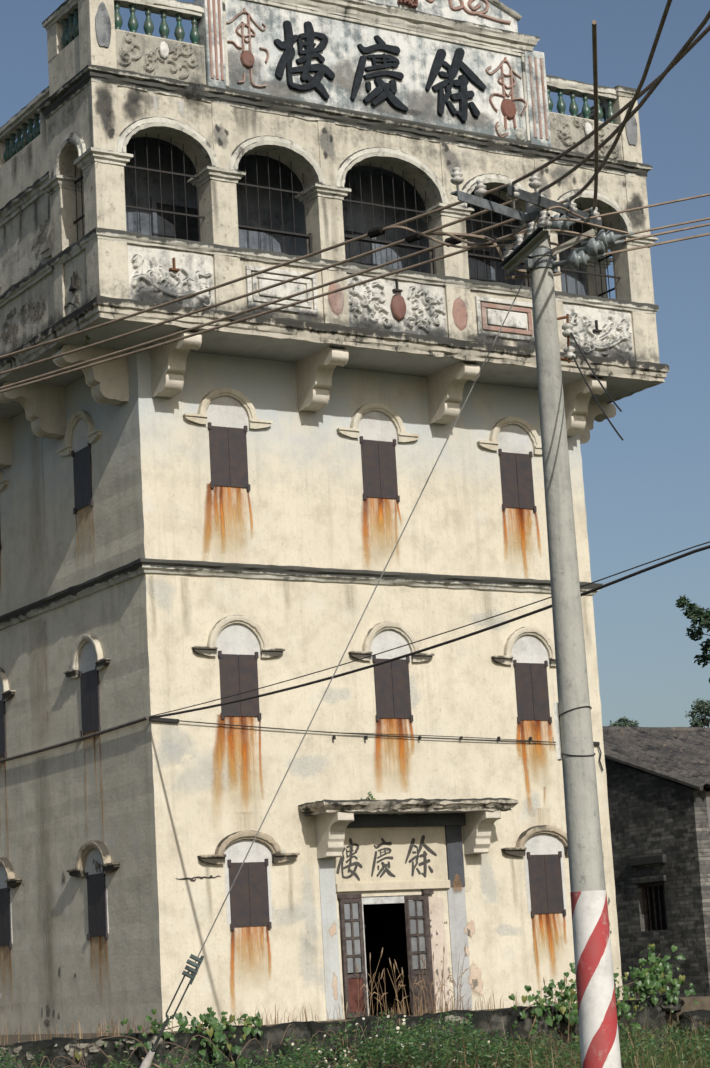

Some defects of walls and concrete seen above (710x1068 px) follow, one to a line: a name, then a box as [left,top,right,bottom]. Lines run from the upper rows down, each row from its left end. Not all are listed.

rust [205,484,253,544]
rust [363,497,401,556]
rust [503,507,540,569]
rust [215,714,262,796]
rust [376,718,414,774]
rust [517,720,552,793]
crack [176,874,221,882]
rust [231,926,271,997]
rust [532,913,566,966]